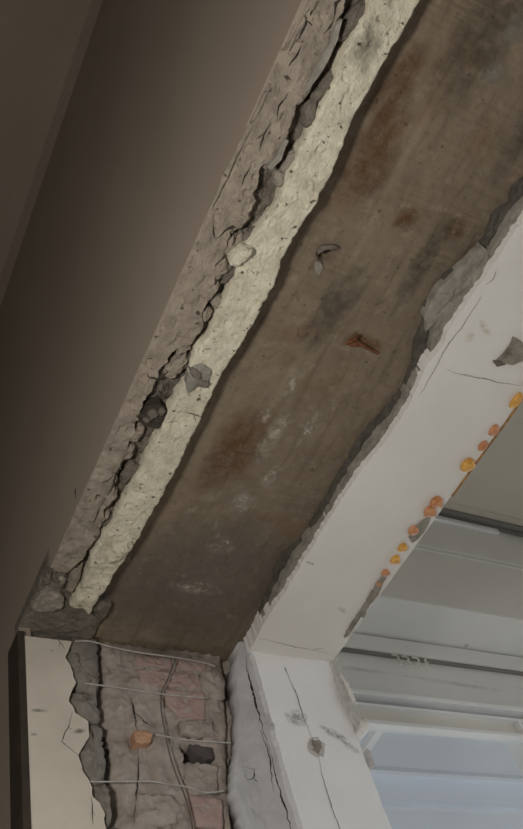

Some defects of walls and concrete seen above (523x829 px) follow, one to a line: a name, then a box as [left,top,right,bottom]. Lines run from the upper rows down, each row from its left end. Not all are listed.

peeling [303,18,342,94]
crack [146,0,365,402]
spalling [137,396,168,429]
spalling [184,363,211,393]
spalling [258,177,523,618]
crack [420,302,522,394]
crack [93,420,154,529]
crack [83,547,91,564]
peeling [344,576,386,638]
spalling [15,549,118,829]
spalling [134,654,226,829]
crack [284,667,340,829]